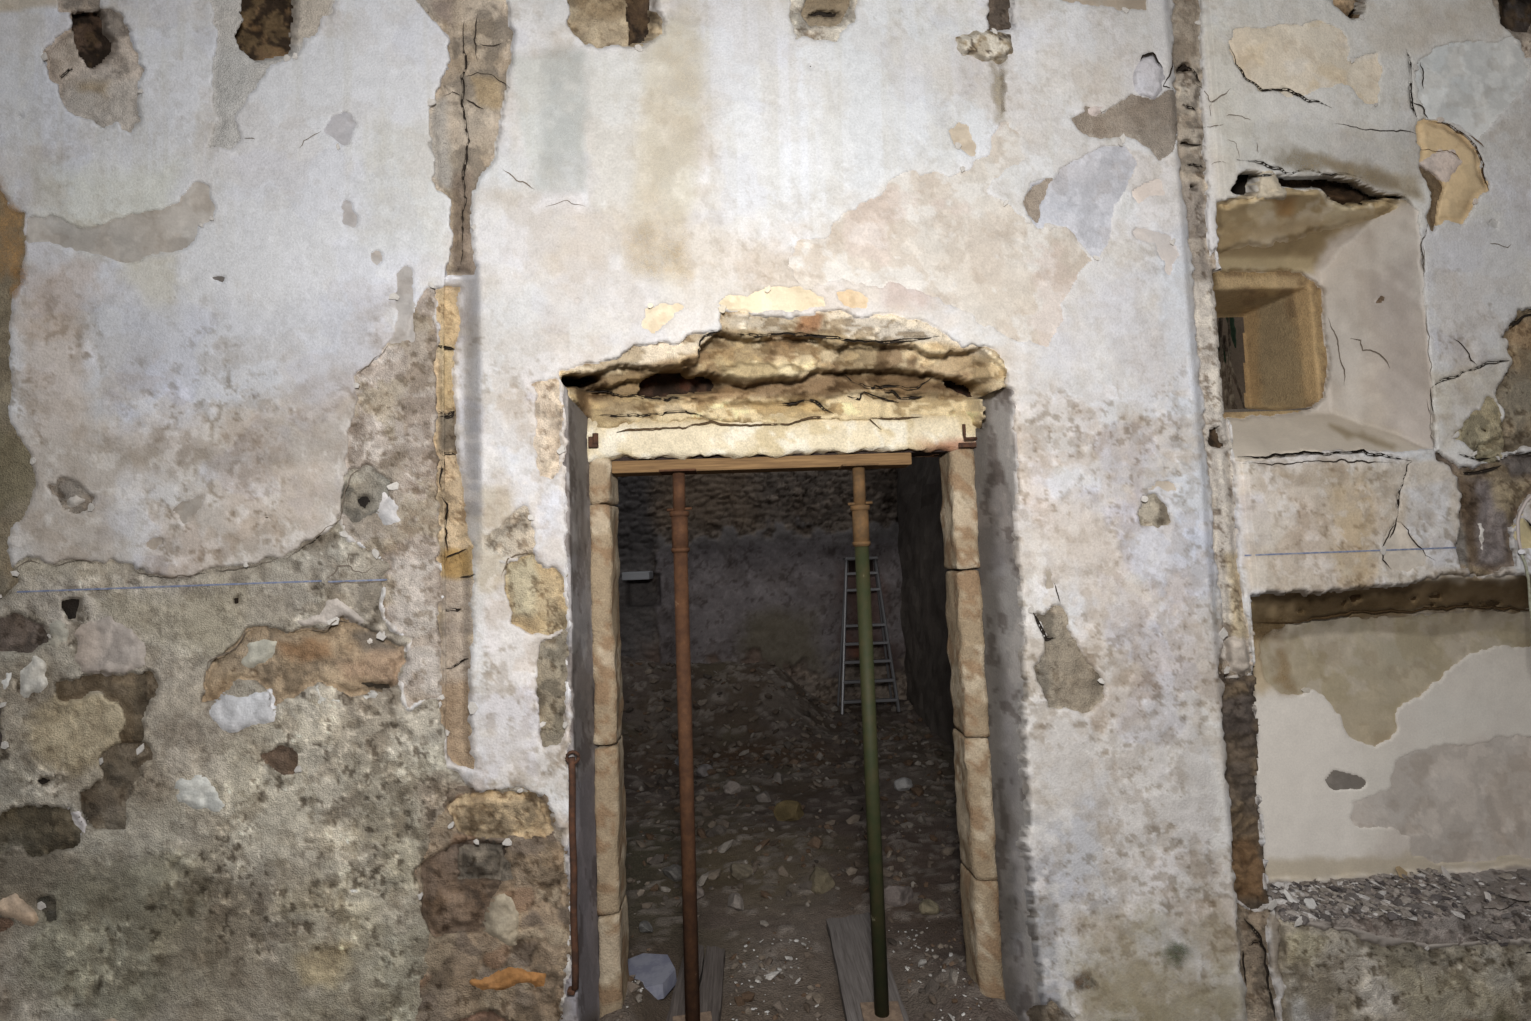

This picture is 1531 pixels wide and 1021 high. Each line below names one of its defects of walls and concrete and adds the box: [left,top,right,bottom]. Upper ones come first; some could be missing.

spalling [72,12,111,68]
crack [447,14,506,270]
crack [505,171,580,207]
spalling [531,64,1188,479]
crack [1419,230,1427,277]
flaking render [1413,0,1531,231]
crack [1238,318,1531,570]
spalling [1452,309,1531,463]
spalling [0,182,572,1021]
spalling [1028,571,1105,713]
flaking render [1259,593,1531,747]
crack [1263,604,1529,624]